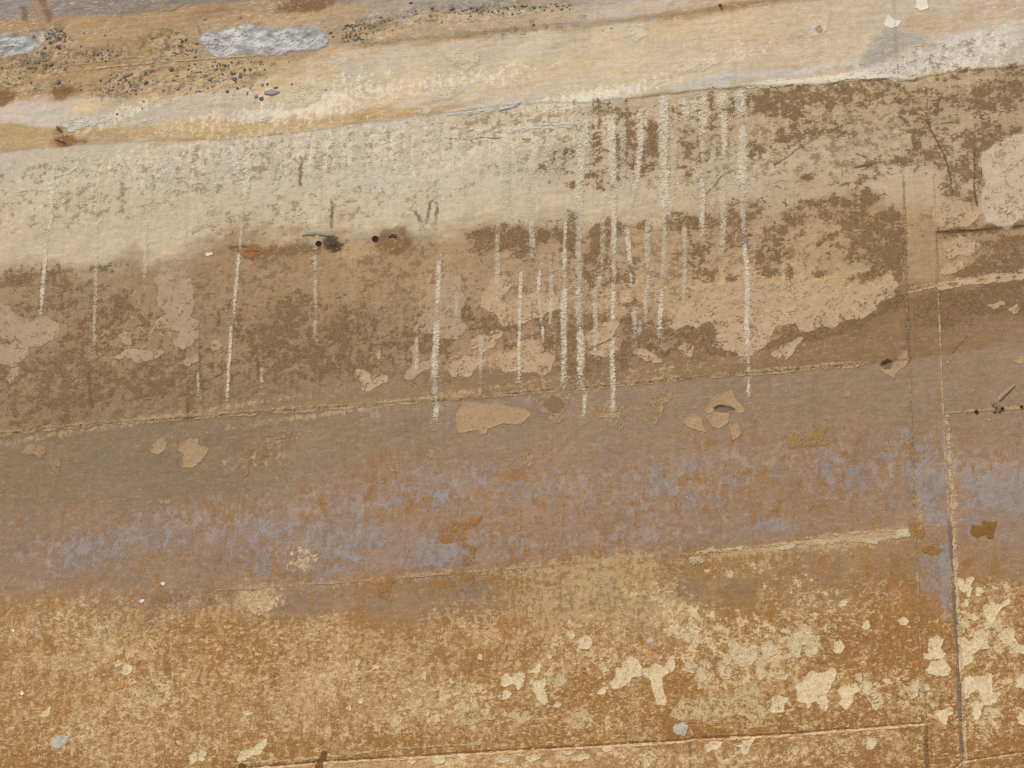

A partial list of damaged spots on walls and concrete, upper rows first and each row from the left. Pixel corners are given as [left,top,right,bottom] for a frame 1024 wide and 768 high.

leakage [183,139,257,410]
leakage [308,102,520,342]
leakage [431,254,443,427]
leakage [501,31,921,424]
peeling [665,133,1024,360]
corrosion [437,517,481,579]
corrosion [908,521,944,554]
corrosion [970,520,998,539]
corrosion [315,751,327,768]
peeling [424,654,589,730]
peeling [597,619,884,755]
peeling [903,576,1024,725]